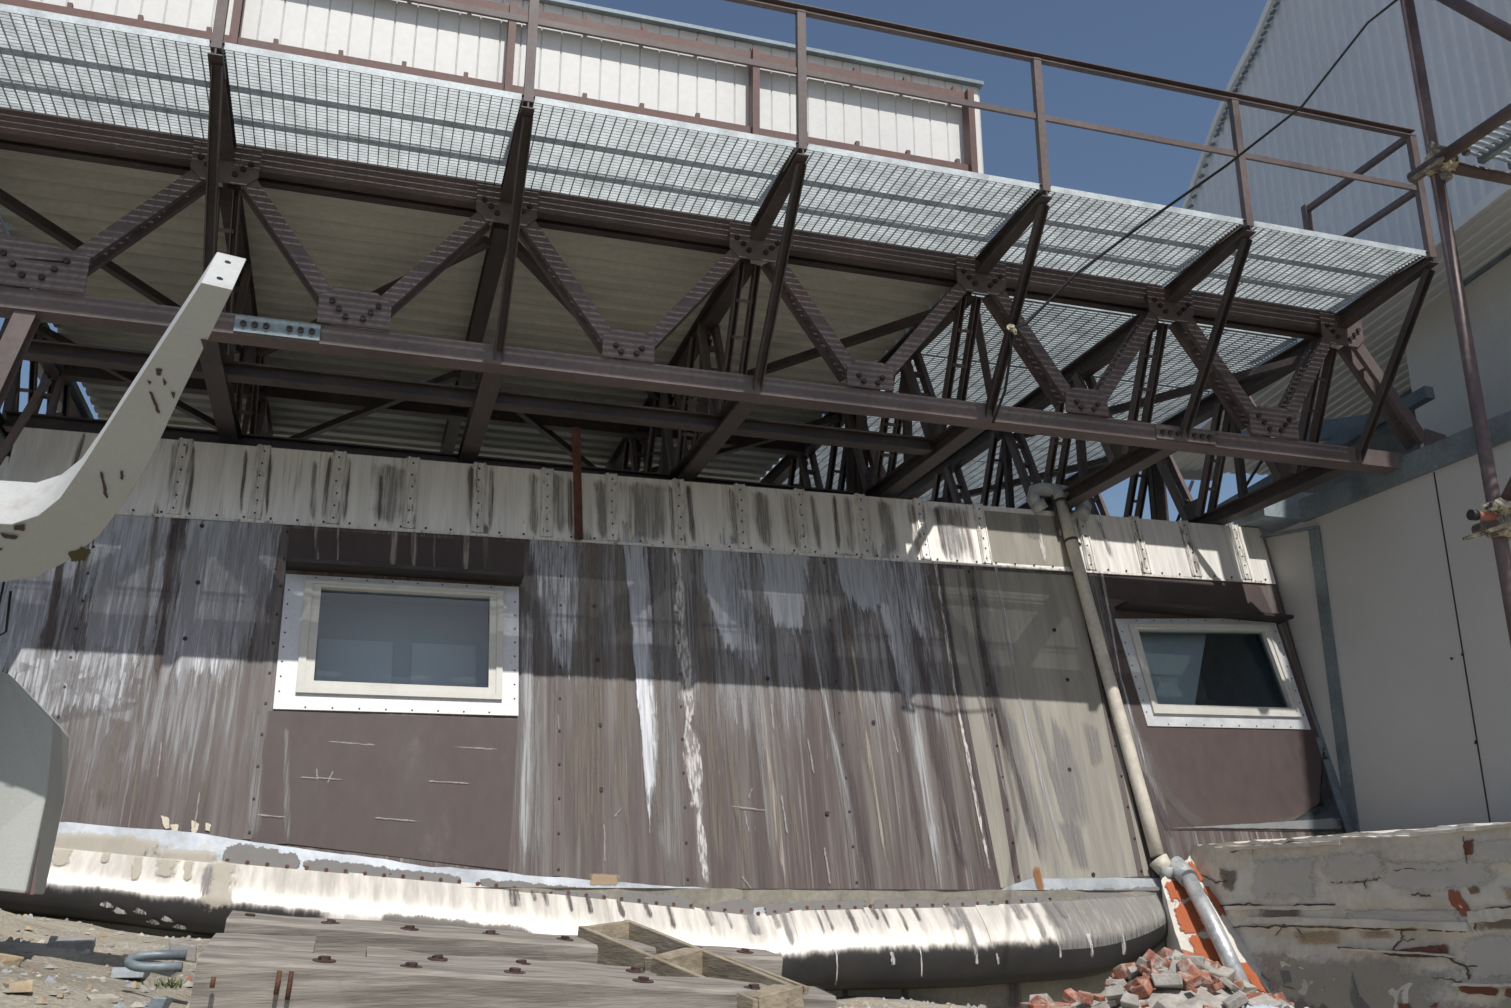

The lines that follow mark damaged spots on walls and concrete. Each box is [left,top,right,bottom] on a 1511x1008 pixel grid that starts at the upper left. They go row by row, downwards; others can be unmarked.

water stain [40,560,84,675]
water stain [139,446,195,679]
water stain [519,614,545,853]
water stain [530,474,750,873]
water stain [756,492,894,882]
water stain [879,502,1077,871]
water stain [52,832,236,909]
water stain [815,907,921,932]
water stain [1011,893,1168,958]
spalling [1259,909,1299,917]
crack [1201,837,1511,983]
flaking render [1394,935,1511,998]